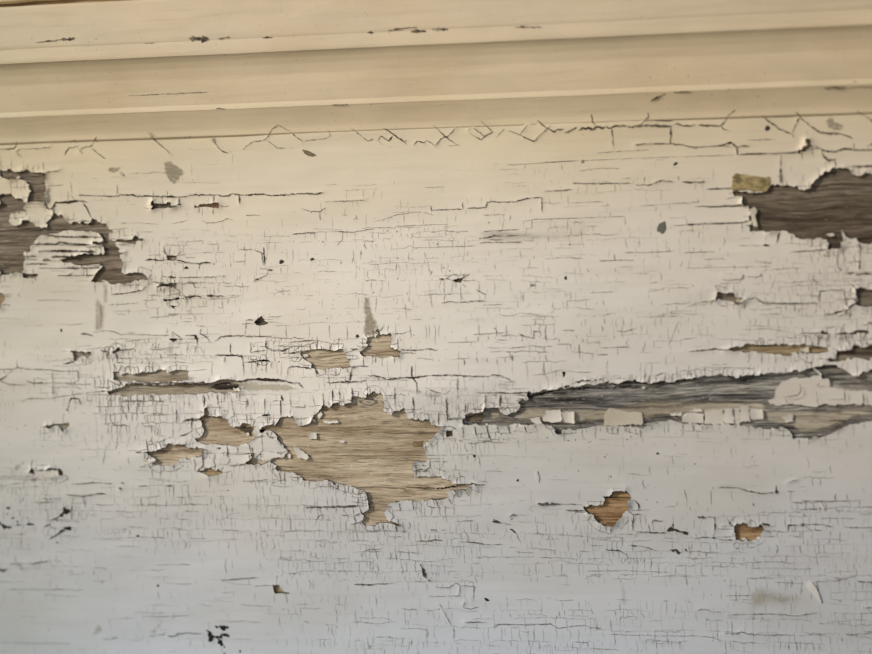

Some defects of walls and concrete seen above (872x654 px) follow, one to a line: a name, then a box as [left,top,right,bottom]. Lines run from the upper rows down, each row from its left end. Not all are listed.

crack [216,125,329,153]
peeling [0,169,149,285]
crack [338,91,872,384]
peeling [732,167,872,250]
peeling [845,287,872,314]
peeling [107,369,243,397]
crack [786,386,865,404]
peeling [142,329,872,527]
peeling [734,523,770,541]
crack [677,595,825,641]